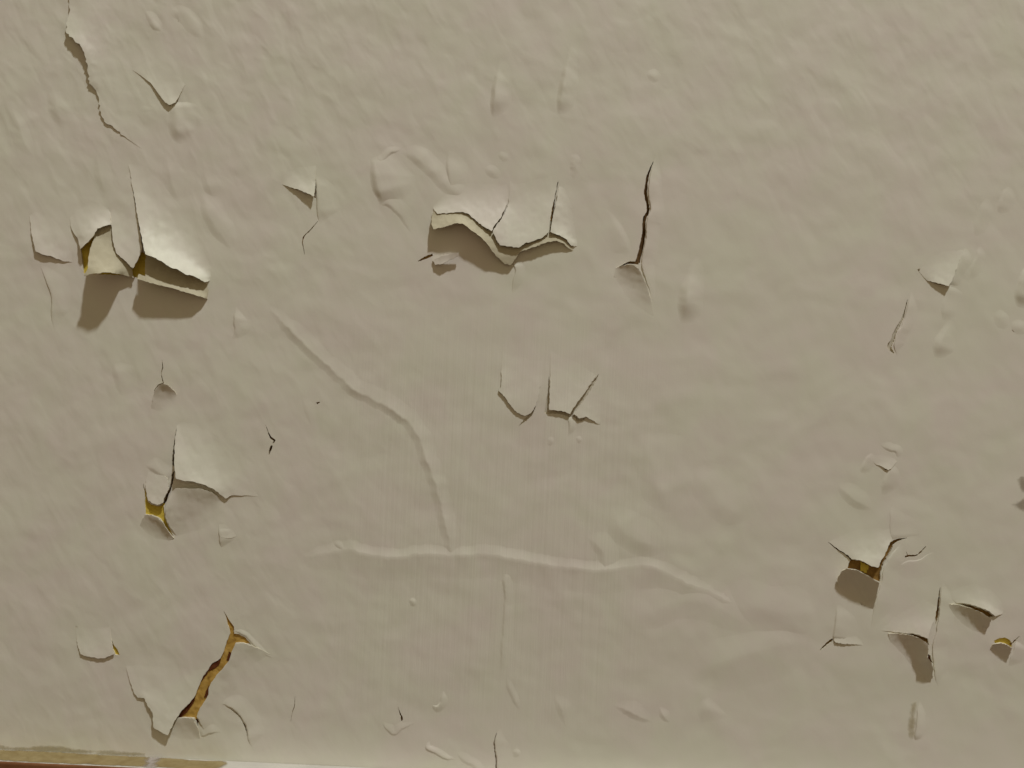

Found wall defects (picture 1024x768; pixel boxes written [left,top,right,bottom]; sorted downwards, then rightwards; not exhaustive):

peeling [66,0,198,149]
peeling [30,164,237,329]
peeling [419,252,459,265]
peeling [431,170,577,294]
crack [600,154,665,316]
crack [887,291,918,356]
peeling [499,350,605,443]
peeling [140,422,258,547]
peeling [76,626,119,659]
peeling [126,614,273,740]
peeling [822,506,1024,688]